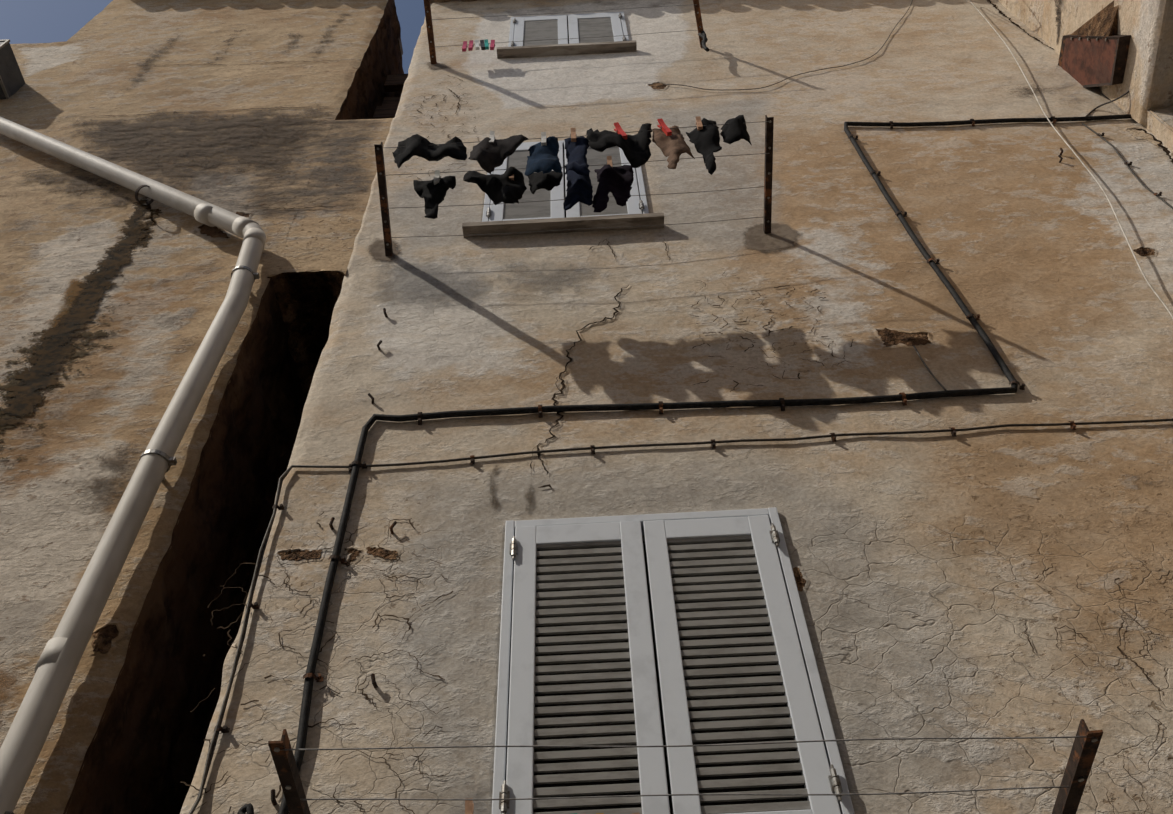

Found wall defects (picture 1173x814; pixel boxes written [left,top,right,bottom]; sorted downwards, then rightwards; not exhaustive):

leakage [71,105,331,180]
crack [1128,127,1173,163]
leakage [136,209,164,247]
leakage [49,303,130,393]
crack [530,239,632,489]
flaking render [872,326,934,349]
leakage [86,441,146,517]
crack [180,511,454,814]
crack [1024,560,1173,813]